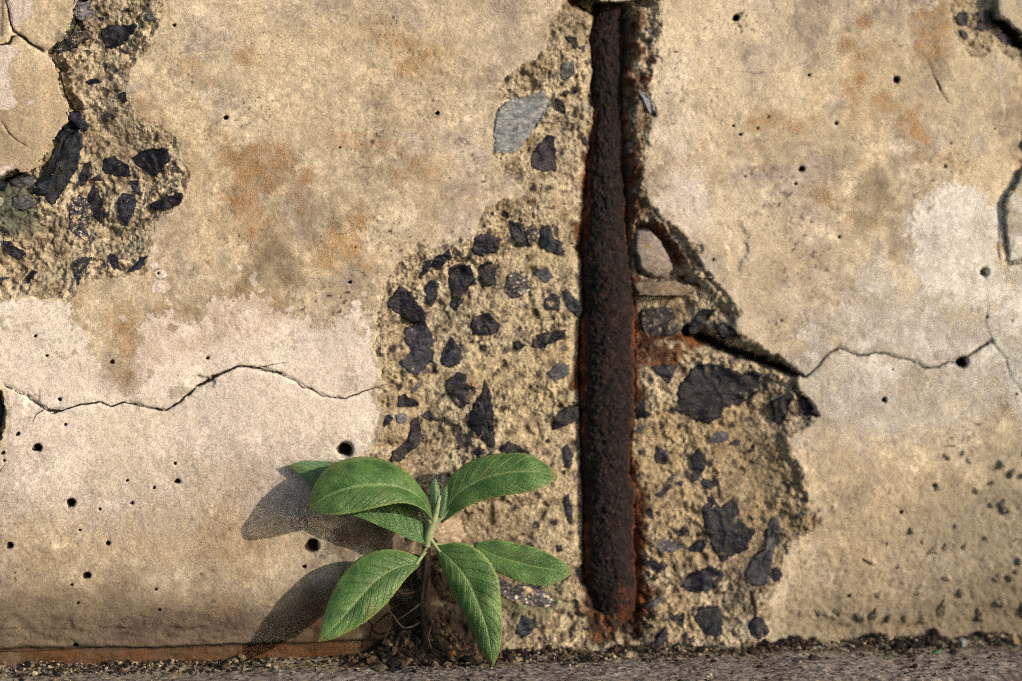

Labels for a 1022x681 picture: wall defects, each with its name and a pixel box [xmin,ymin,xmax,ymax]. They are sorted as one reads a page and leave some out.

crack [0,0,84,116]
spalling [949,0,1022,67]
crack [992,15,1022,48]
corrosion [619,12,702,291]
flaking render [1002,168,1022,261]
crack [6,362,386,421]
spalling [0,0,822,653]
corrosion [569,337,581,391]
corrosion [633,322,706,403]
crack [693,304,1021,414]
water stain [797,171,1022,432]
corrosion [573,461,658,647]